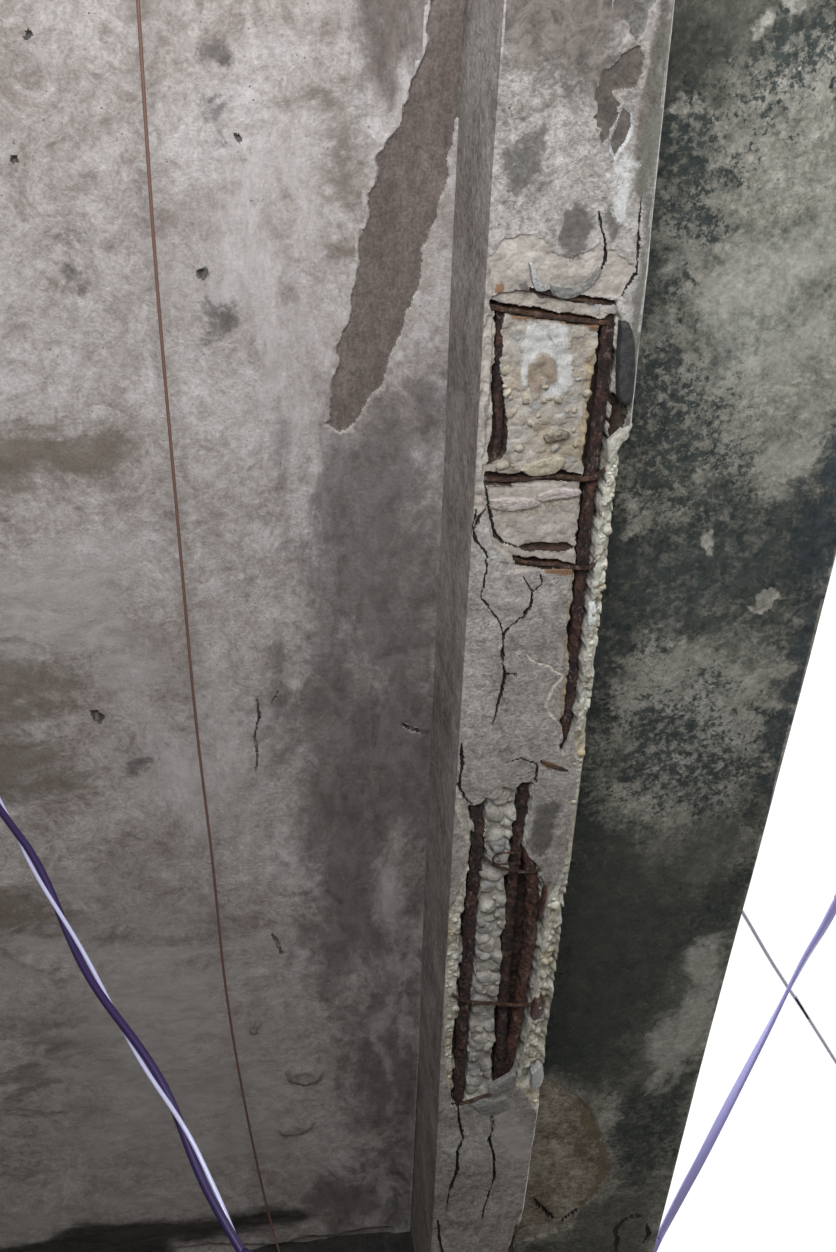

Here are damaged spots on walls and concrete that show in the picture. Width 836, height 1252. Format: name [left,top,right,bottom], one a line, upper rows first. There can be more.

peeling [593,0,657,160]
flaking render [323,0,464,434]
rust [512,306,599,330]
rust [579,356,595,466]
crack [598,196,642,297]
leakage [273,387,447,1176]
crack [472,482,543,724]
spalling [444,233,635,1252]
rust [545,559,576,735]
leakage [543,0,836,1252]
leakage [56,946,287,1164]
crack [436,1106,496,1252]